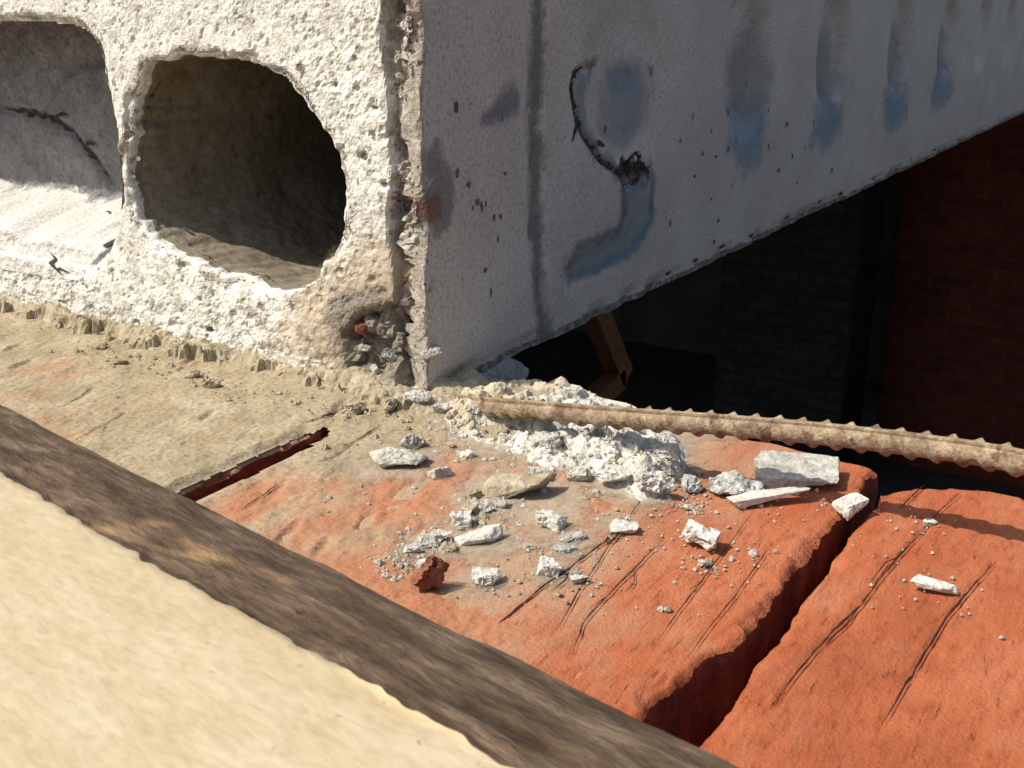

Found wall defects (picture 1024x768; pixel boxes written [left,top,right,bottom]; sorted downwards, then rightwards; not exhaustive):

spalling [126,43,260,98]
spalling [272,64,319,116]
crack [5,108,110,179]
spalling [118,112,254,301]
spalling [354,0,442,391]
spalling [285,211,350,310]